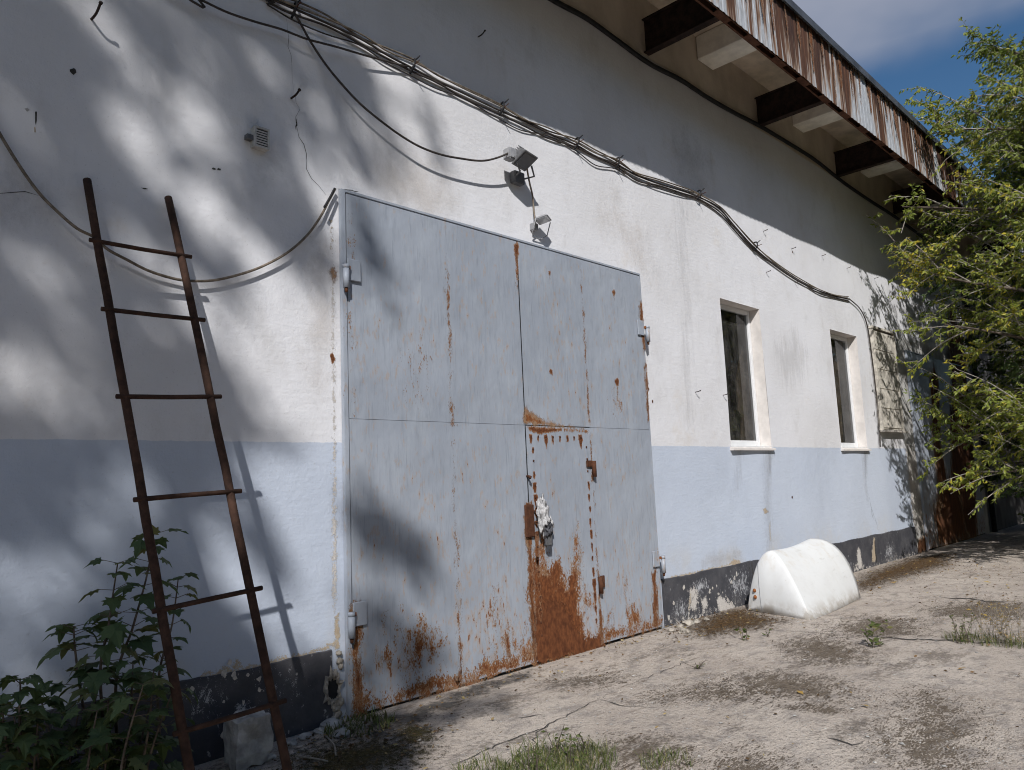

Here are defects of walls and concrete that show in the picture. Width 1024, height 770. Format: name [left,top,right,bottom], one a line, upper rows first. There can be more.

corrosion [761,0,935,177]
corrosion [444,269,452,362]
peeling [186,278,344,721]
corrosion [347,285,663,718]
peeling [661,558,751,625]
peeling [848,538,916,571]